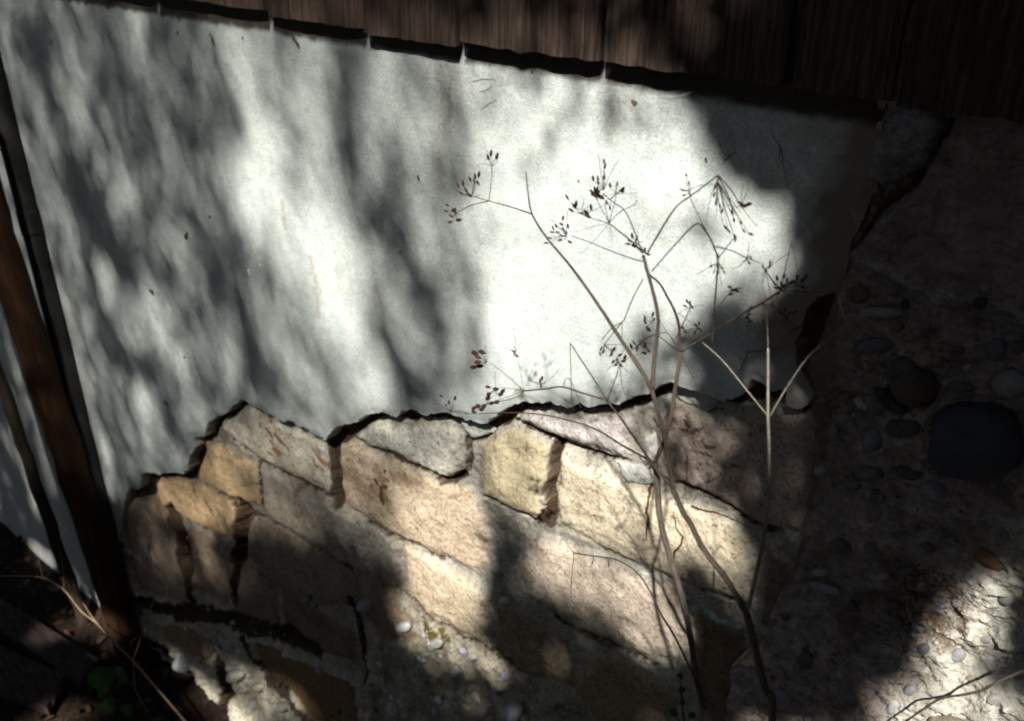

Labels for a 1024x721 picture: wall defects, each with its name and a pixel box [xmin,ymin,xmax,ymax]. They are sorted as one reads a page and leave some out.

peeling [461,420,496,438]
peeling [617,386,719,484]